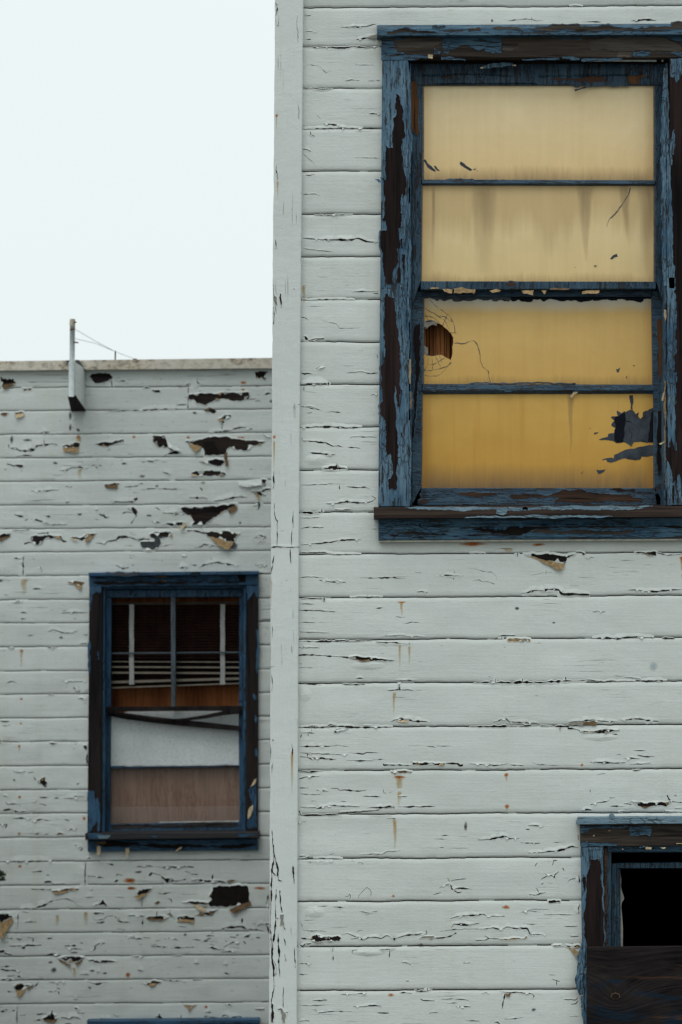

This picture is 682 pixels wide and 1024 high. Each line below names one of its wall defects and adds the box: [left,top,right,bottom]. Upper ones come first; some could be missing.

peeling [381,21,682,91]
peeling [375,80,432,492]
peeling [89,372,114,387]
peeling [146,388,266,478]
peeling [614,413,626,443]
peeling [139,502,241,552]
peeling [522,551,576,570]
crack [469,715,660,821]
peeling [134,864,251,924]
crack [0,715,602,1024]